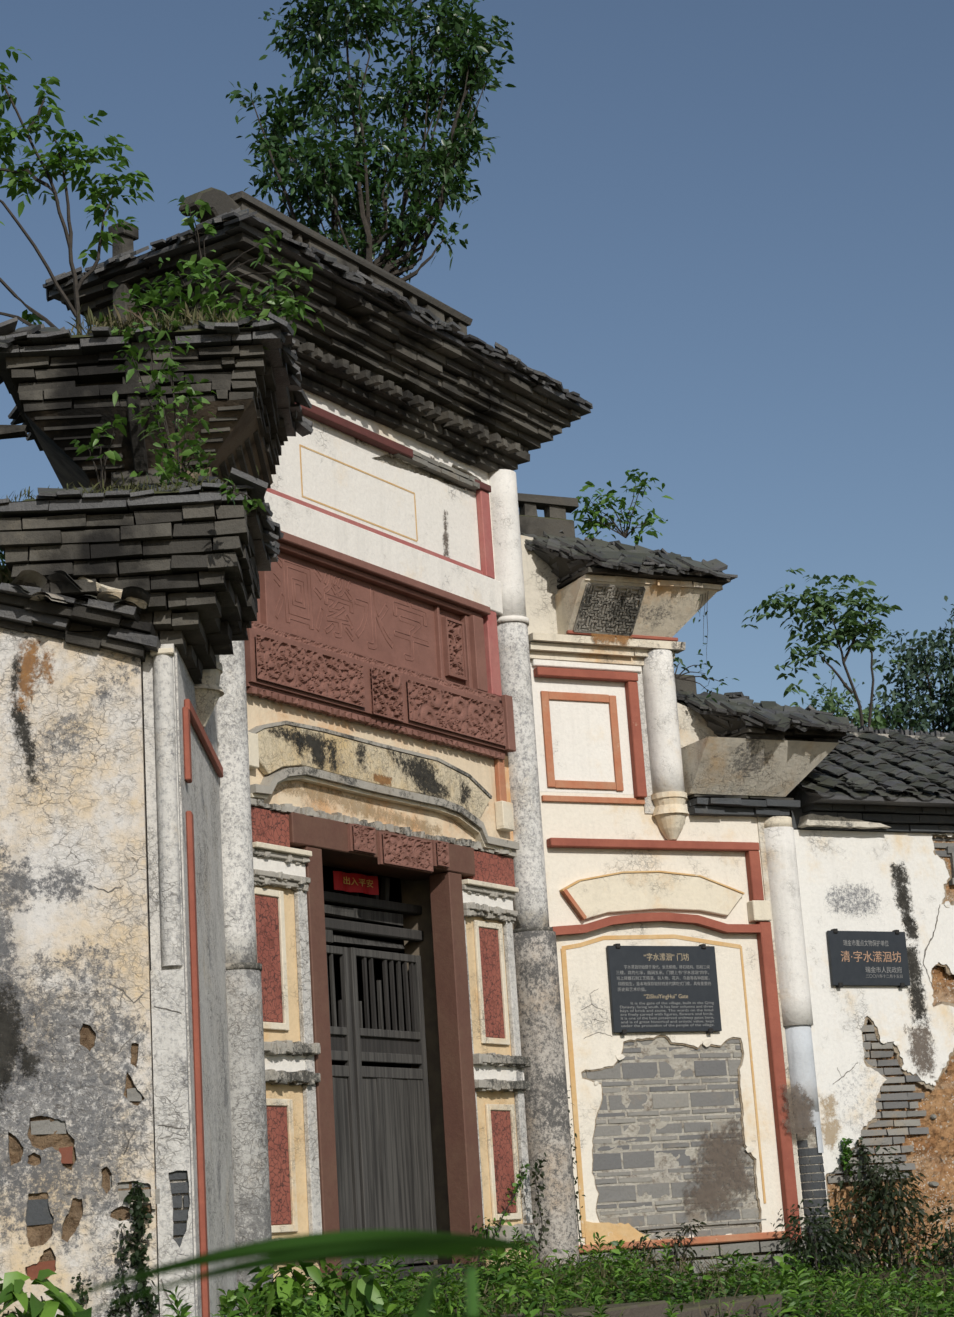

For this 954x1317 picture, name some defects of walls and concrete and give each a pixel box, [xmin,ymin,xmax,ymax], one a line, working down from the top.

damp [10,654,39,784]
damp [269,726,338,772]
damp [387,750,471,806]
damp [890,861,936,1078]
spalling [932,966,954,1006]
damp [0,972,64,1104]
spalling [124,1043,145,1106]
spalling [9,1116,77,1170]
spalling [582,1037,766,1240]
spalling [796,1020,954,1271]
spalling [26,1192,83,1281]
spalling [102,1167,190,1247]